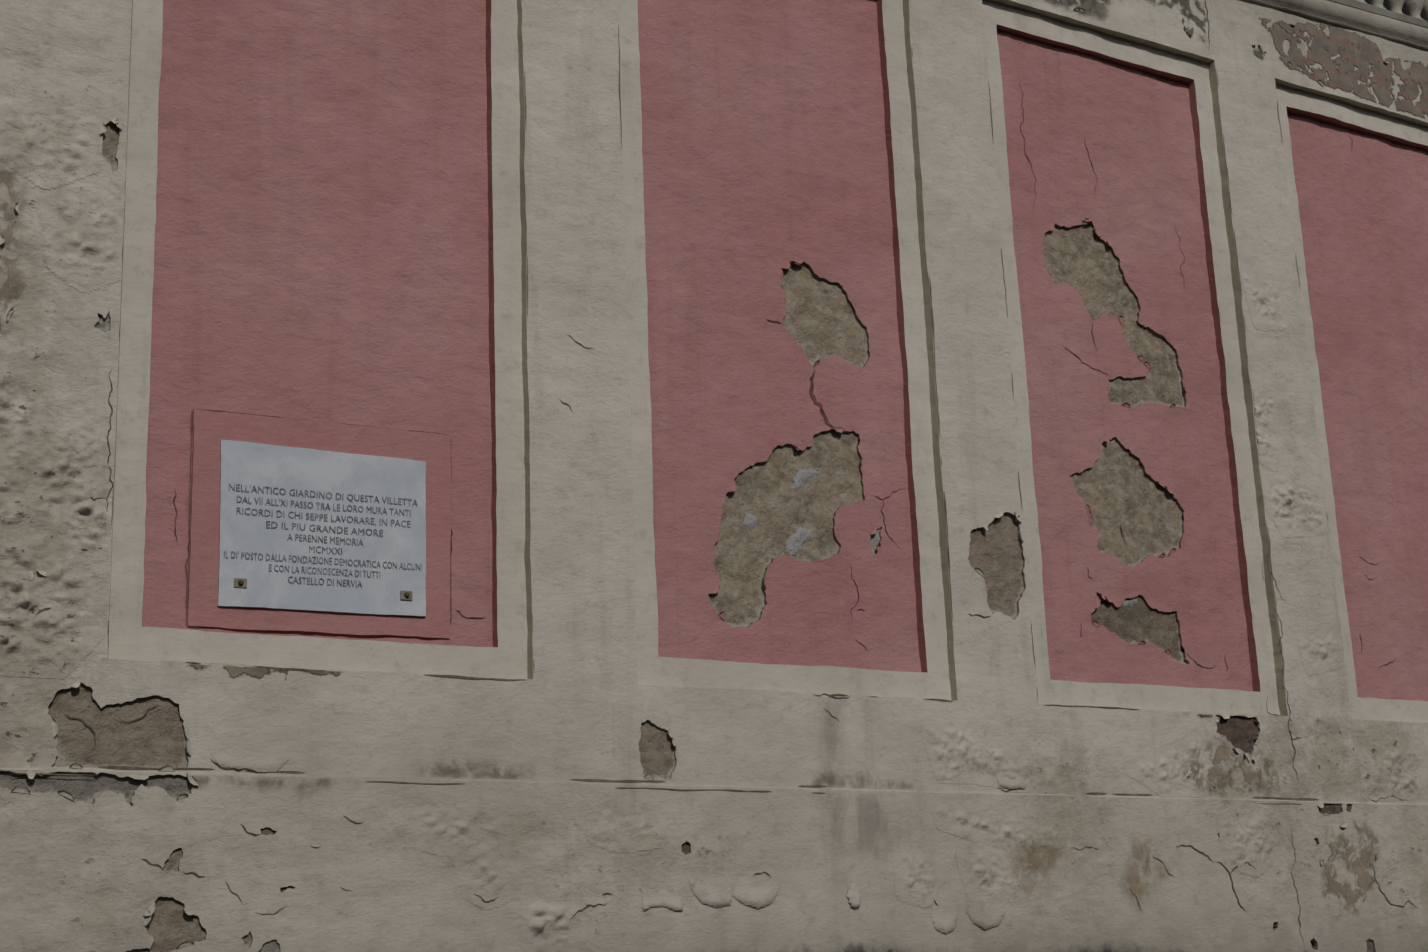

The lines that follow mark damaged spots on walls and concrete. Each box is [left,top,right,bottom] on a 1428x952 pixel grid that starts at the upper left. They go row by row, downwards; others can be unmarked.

peeling [1252,17,1428,118]
spalling [1042,218,1186,408]
crack [809,371,845,430]
spalling [708,428,865,629]
spalling [968,512,1026,620]
spalling [1070,437,1184,567]
spalling [1091,592,1189,665]
spalling [0,681,199,805]
spalling [638,720,677,781]
spalling [1186,714,1275,795]
spalling [126,896,207,952]
crack [1154,844,1256,909]